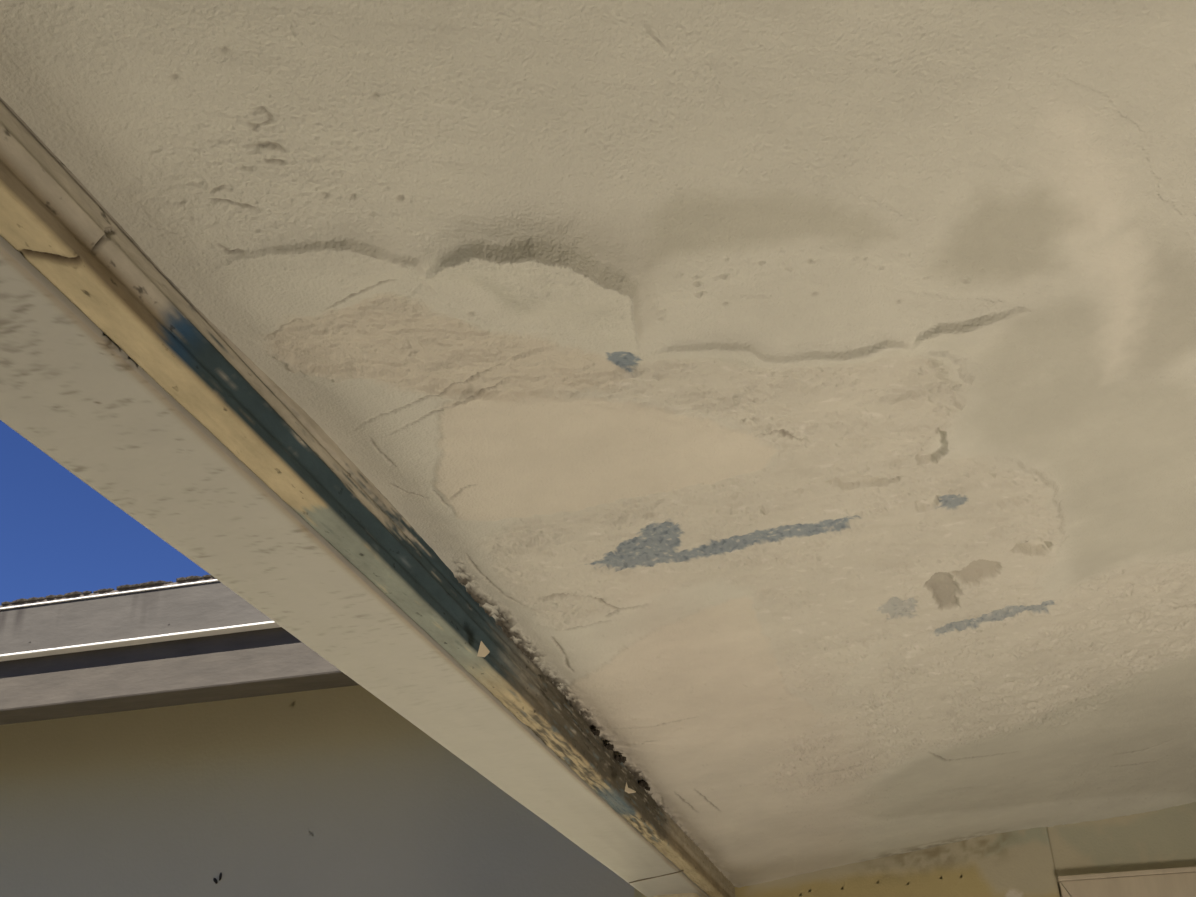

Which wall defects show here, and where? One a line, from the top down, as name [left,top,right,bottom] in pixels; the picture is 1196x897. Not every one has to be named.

flaking render [656,307,1029,372]
leakage [0,587,175,646]
peeling [477,641,490,657]
leakage [445,556,704,848]
spalling [752,554,1196,801]